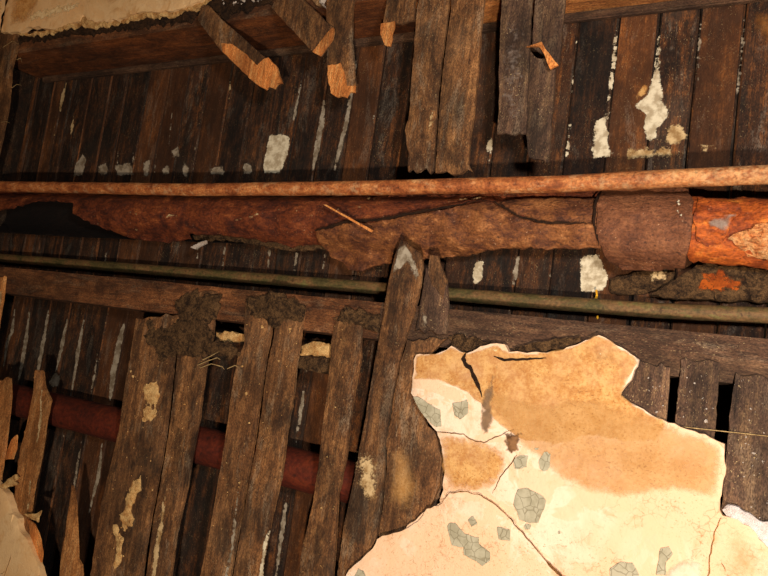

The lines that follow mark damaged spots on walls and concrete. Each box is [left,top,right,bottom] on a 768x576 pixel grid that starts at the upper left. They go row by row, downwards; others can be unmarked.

rust [316,197,602,272]
rust [728,223,768,260]
rust [699,269,740,291]
crack [461,353,482,397]
crack [494,354,544,362]
peeling [510,336,582,353]
peeling [413,397,442,427]
crack [441,429,514,443]
damp [415,337,716,493]
crack [440,455,562,576]
peeling [513,488,546,530]
peeling [447,517,490,566]